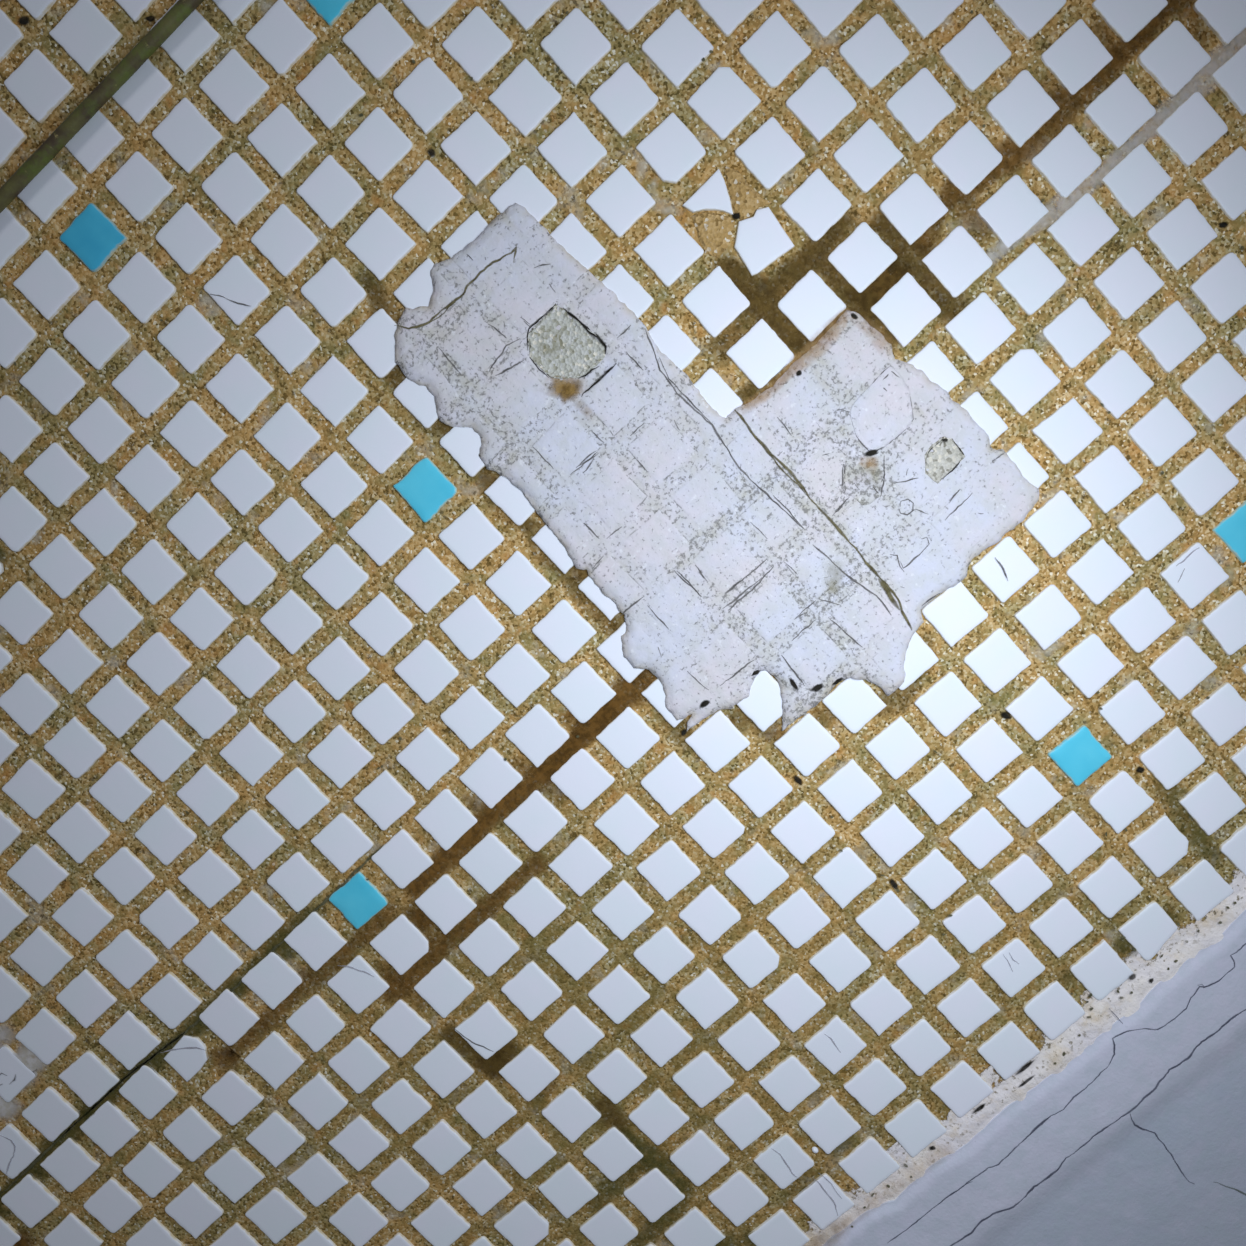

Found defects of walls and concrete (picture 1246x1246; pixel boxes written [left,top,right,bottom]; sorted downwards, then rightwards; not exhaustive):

damp [1026,29,1246,234]
crack [533,423,646,475]
crack [618,325,984,689]
damp [0,1028,45,1073]
crack [888,943,1246,1246]